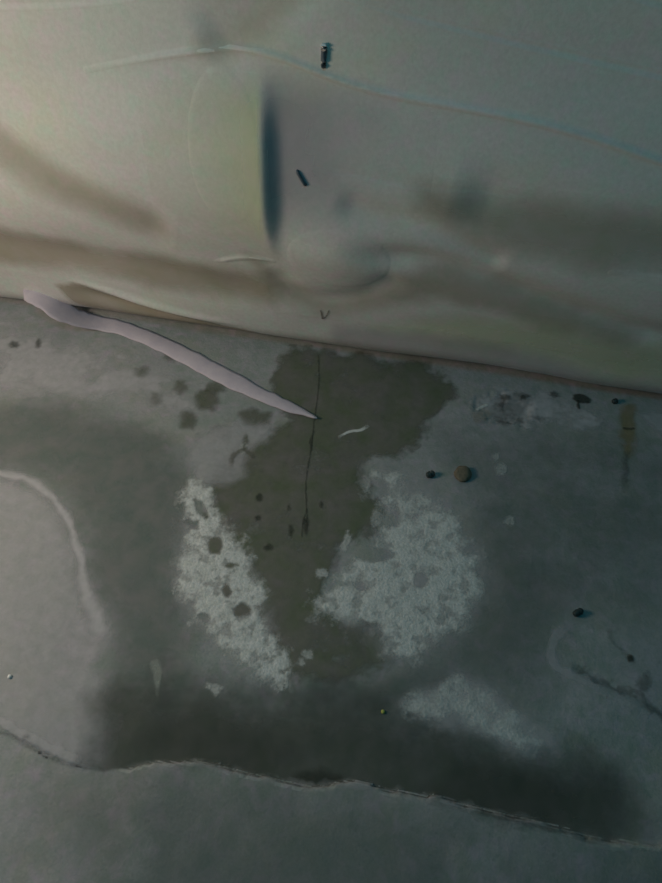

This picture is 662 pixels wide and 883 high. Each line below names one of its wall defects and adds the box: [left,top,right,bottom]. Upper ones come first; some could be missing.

peeling [23,289,318,419]
leakage [0,336,622,840]